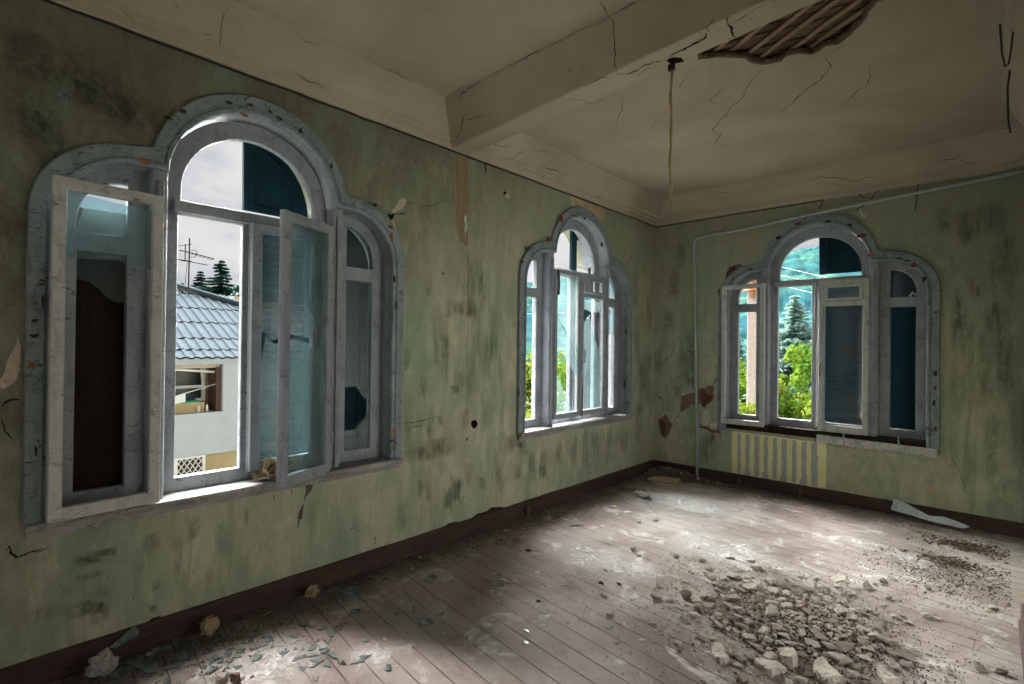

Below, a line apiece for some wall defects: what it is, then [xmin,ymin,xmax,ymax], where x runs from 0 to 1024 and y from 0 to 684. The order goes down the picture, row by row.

spalling [697,0,882,65]
crack [443,1,769,136]
peeling [453,153,470,247]
peeling [0,295,44,388]
spalling [658,414,673,439]
spalling [680,385,717,430]
crack [6,546,47,558]